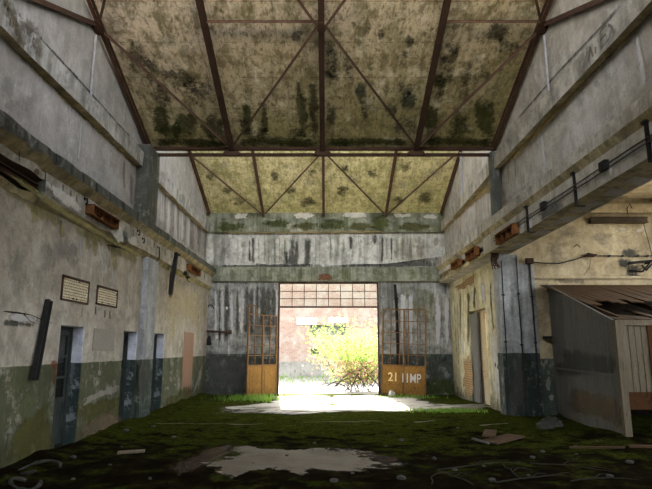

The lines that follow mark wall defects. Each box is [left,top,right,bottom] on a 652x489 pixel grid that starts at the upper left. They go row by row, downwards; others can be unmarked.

leakage [488,19,519,55]
leakage [433,43,458,101]
leakage [240,82,319,147]
leakage [355,83,368,119]
leakage [331,119,413,146]
leakage [386,84,496,147]
leakage [285,240,311,265]
leakage [214,286,278,345]
leakage [400,294,413,345]
leakage [435,294,449,344]
peeling [225,325,500,415]